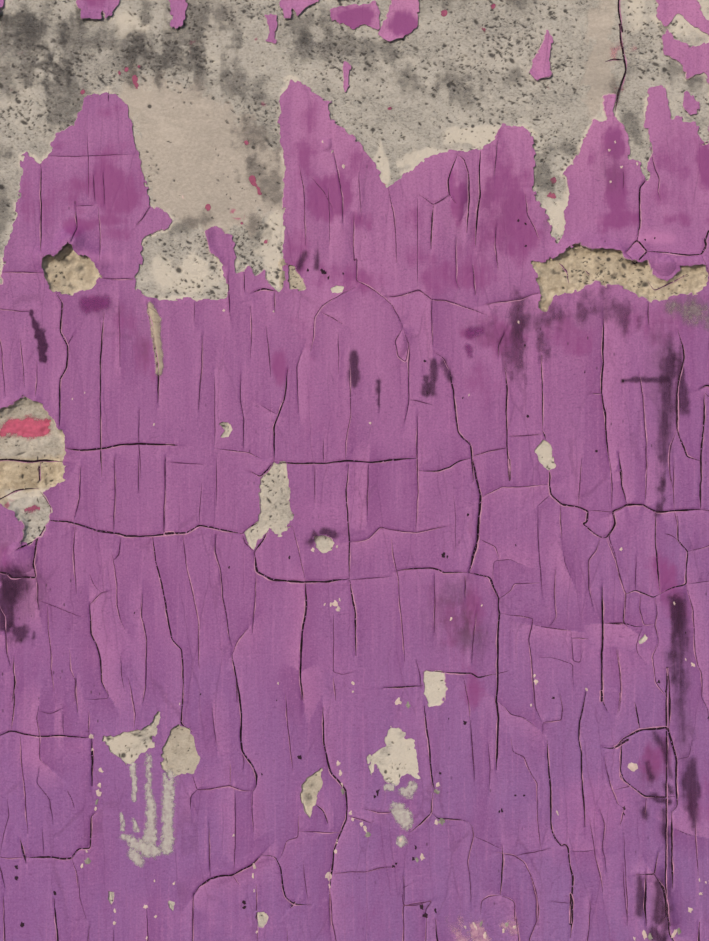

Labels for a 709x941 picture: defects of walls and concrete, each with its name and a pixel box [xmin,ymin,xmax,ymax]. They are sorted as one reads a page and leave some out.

crack [10,136,133,280]
crack [298,166,306,245]
crack [315,152,344,243]
peeling [0,0,709,312]
crack [388,189,397,263]
crack [417,152,481,280]
crack [623,153,709,325]
spalling [0,395,66,545]
peeling [244,461,294,550]
peeling [424,671,447,707]
peeling [102,711,200,778]
peeling [367,726,420,786]